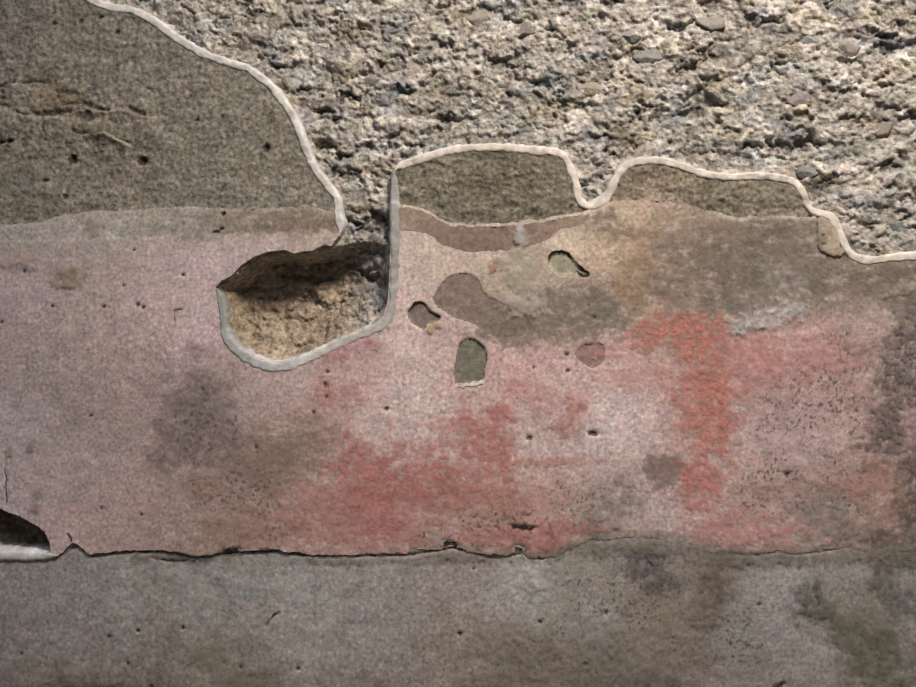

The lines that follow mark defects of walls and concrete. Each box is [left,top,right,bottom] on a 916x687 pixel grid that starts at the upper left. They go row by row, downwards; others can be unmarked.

crack [0,80,106,134]
spalling [102,0,916,256]
flaking render [548,250,590,277]
flaking render [408,273,531,339]
flaking render [454,339,488,388]
damp [643,220,916,616]
crack [64,533,542,562]
crack [712,547,915,556]